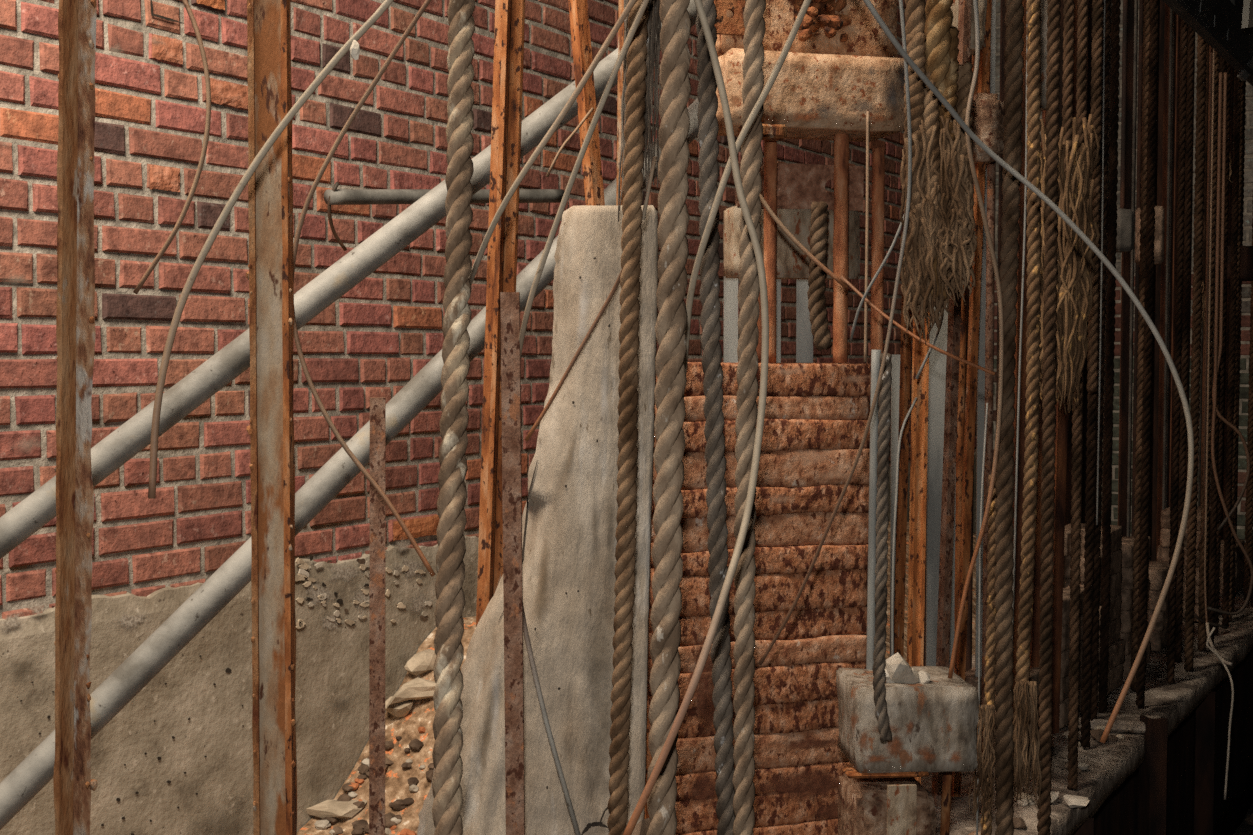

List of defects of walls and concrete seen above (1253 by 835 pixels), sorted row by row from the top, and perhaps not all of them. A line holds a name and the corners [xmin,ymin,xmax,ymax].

rust [762,99,819,141]
rust [695,642,715,736]
rust [760,716,934,819]